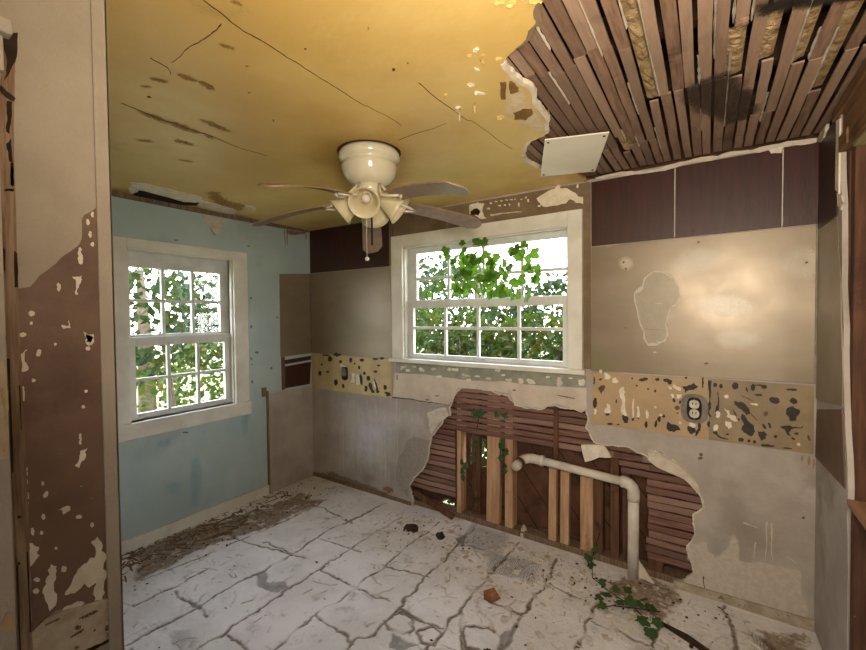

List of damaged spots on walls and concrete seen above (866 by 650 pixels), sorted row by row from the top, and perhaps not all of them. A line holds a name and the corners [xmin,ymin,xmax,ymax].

damp [754,0,862,19]
crack [150,0,512,149]
flaking render [442,0,866,223]
damp [675,69,763,126]
peeling [78,212,94,264]
flaking render [128,182,256,235]
flaking render [393,213,461,237]
peeling [21,349,41,401]
peeling [75,433,88,468]
flaking render [392,362,809,617]
peeling [29,528,43,566]
peeling [33,506,107,611]